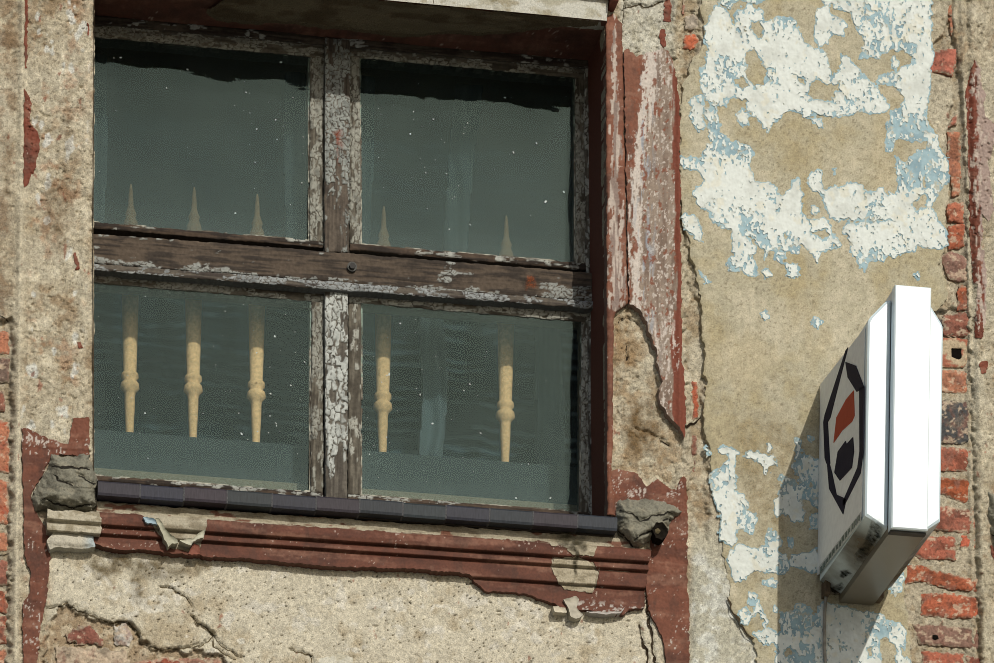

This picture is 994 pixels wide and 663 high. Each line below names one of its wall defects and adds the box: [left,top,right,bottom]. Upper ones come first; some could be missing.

peeling [23,89,40,187]
flaking render [614,309,678,483]
peeling [659,0,994,663]
flaking render [0,331,10,663]
crack [52,587,242,660]
crack [638,596,656,663]